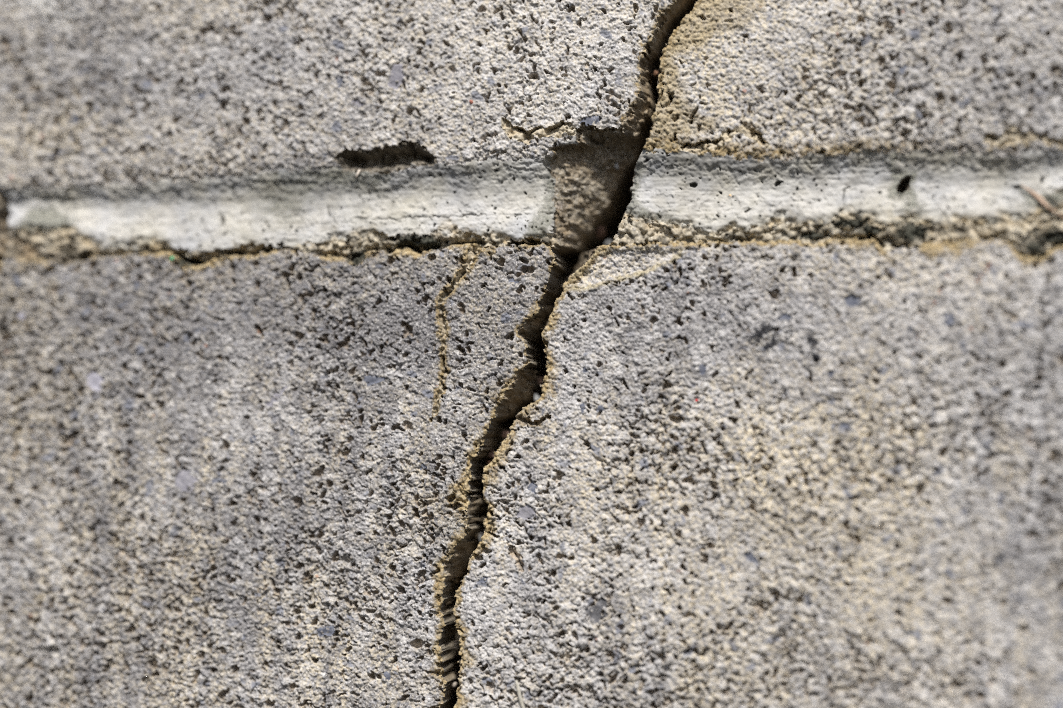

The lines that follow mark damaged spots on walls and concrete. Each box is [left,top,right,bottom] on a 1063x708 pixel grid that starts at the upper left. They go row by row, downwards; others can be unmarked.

spalling [333,140,438,175]
crack [501,117,577,145]
crack [606,0,1063,259]
spalling [0,189,85,267]
crack [9,226,599,708]